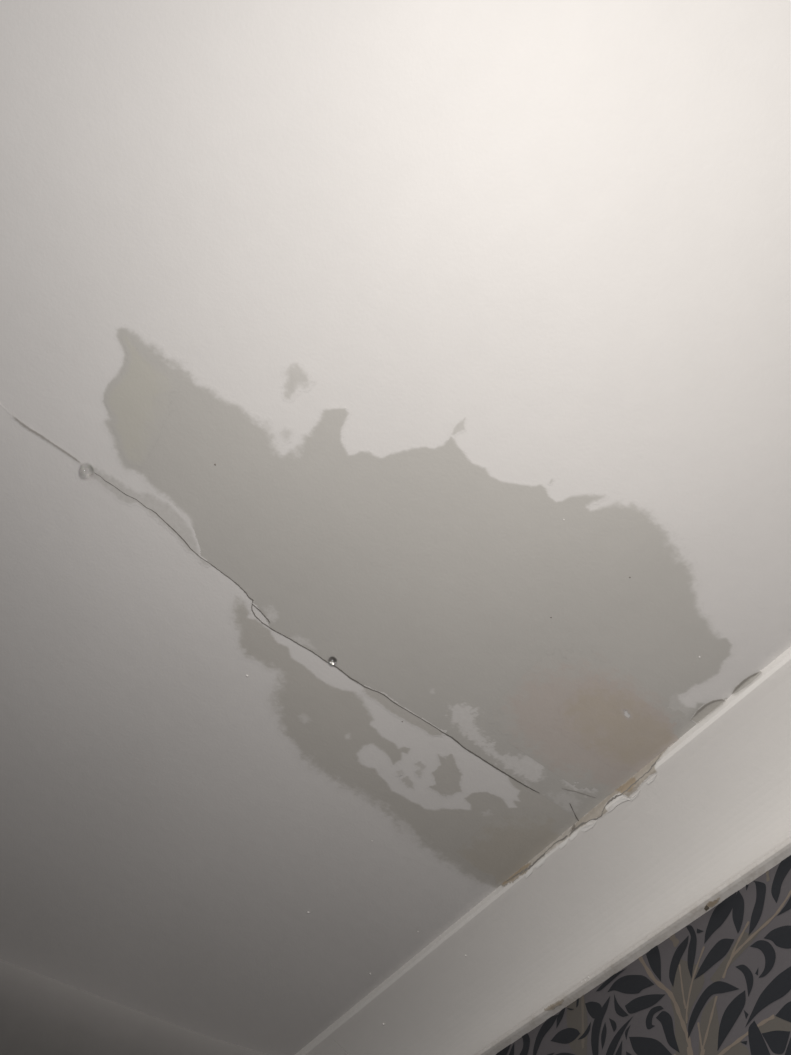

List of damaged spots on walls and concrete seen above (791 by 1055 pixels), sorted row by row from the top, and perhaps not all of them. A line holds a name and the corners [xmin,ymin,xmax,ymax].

crack [0,403,595,821]
leakage [89,323,735,890]